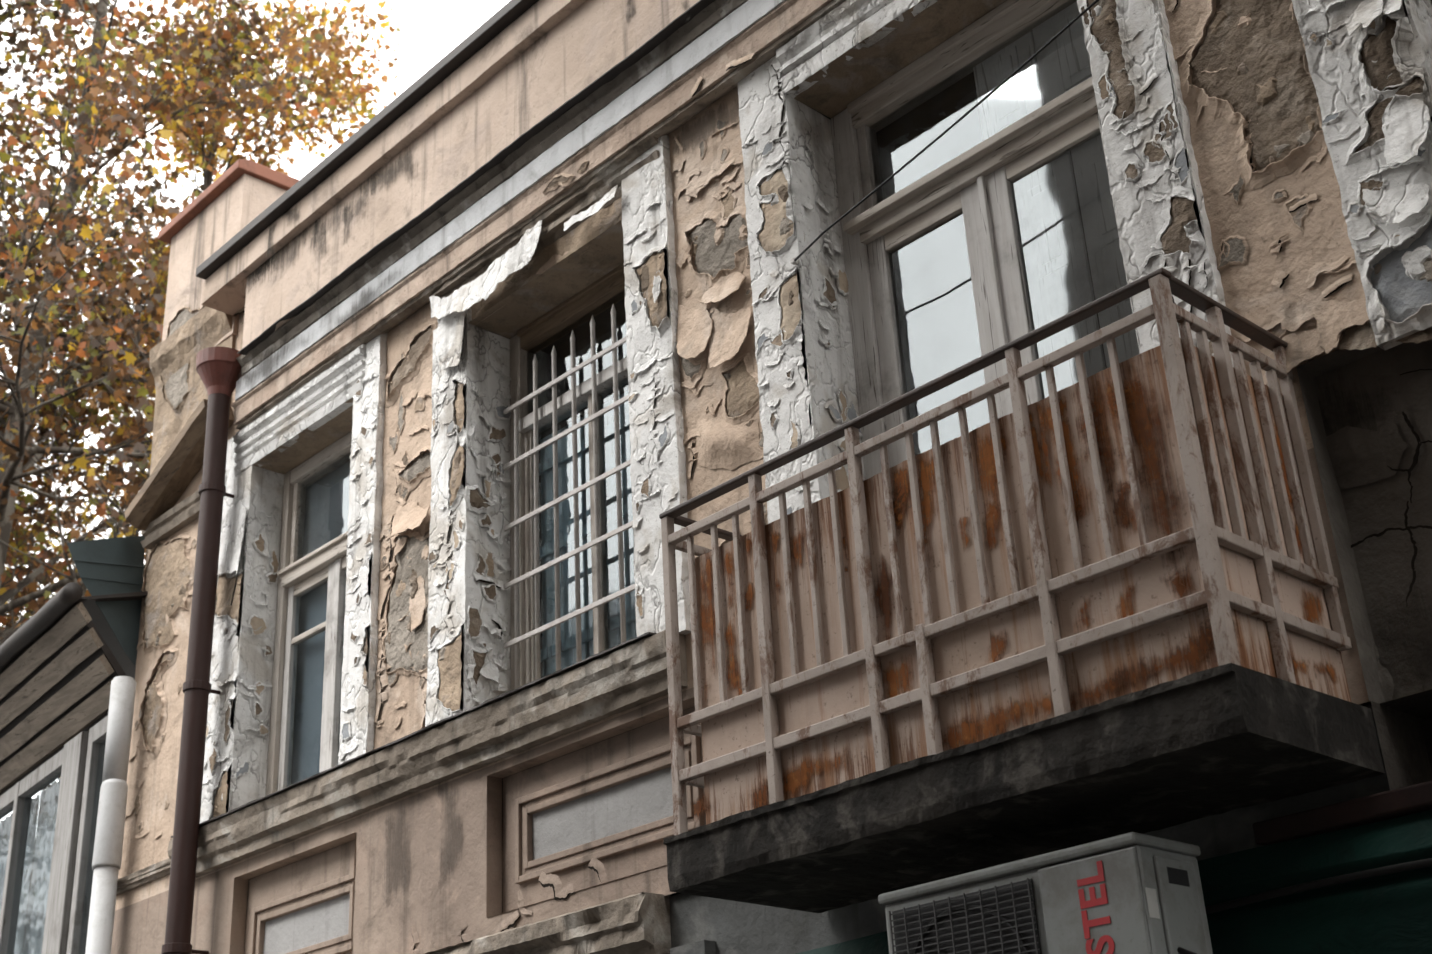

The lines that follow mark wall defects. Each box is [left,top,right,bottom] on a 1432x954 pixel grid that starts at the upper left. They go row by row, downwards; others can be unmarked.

peeling [564,185,618,231]
spalling [623,90,863,529]
peeling [203,672,273,819]
peeling [213,502,280,657]
spalling [346,220,542,729]
rust [874,556,896,641]
rust [892,458,936,558]
rust [959,429,1006,548]
rust [942,695,1052,749]
rust [1029,374,1194,598]
rust [1070,622,1215,711]
crack [1351,411,1432,607]